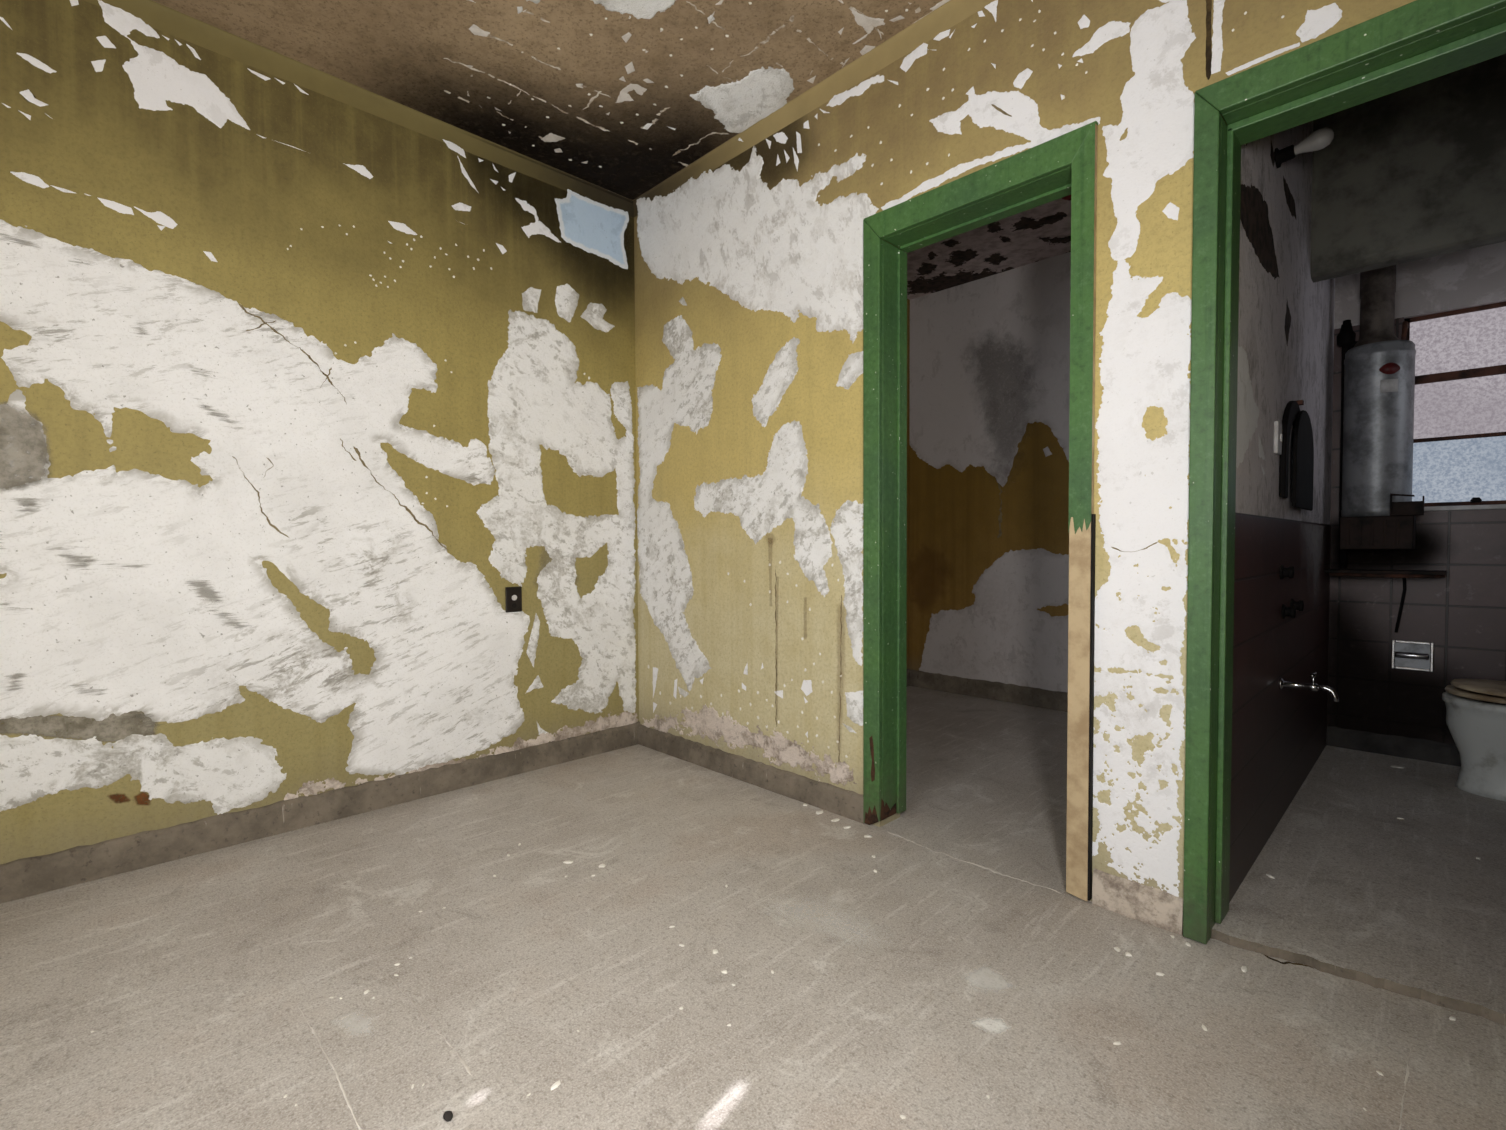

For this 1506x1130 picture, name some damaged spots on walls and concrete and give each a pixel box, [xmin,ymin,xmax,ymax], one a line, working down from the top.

peeling [2,89,53,120]
peeling [17,53,57,73]
peeling [91,0,309,152]
peeling [598,51,654,131]
peeling [766,29,954,172]
peeling [11,172,178,231]
peeling [343,163,373,179]
peeling [388,221,417,243]
peeling [443,139,629,269]
peeling [522,284,615,332]
peeling [881,0,1342,897]
spalling [284,667,875,800]